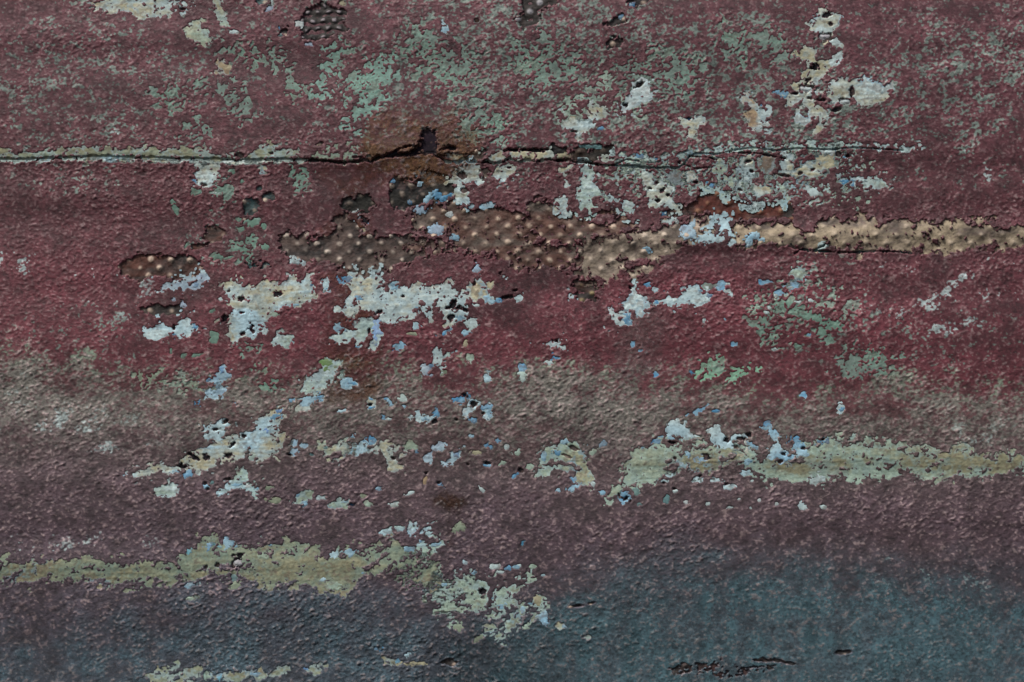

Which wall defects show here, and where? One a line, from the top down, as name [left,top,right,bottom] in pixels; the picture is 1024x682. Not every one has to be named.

crack [268,141,452,165]
crack [484,148,639,166]
crack [683,151,773,168]
spalling [0,0,1024,511]
peeling [0,520,567,646]